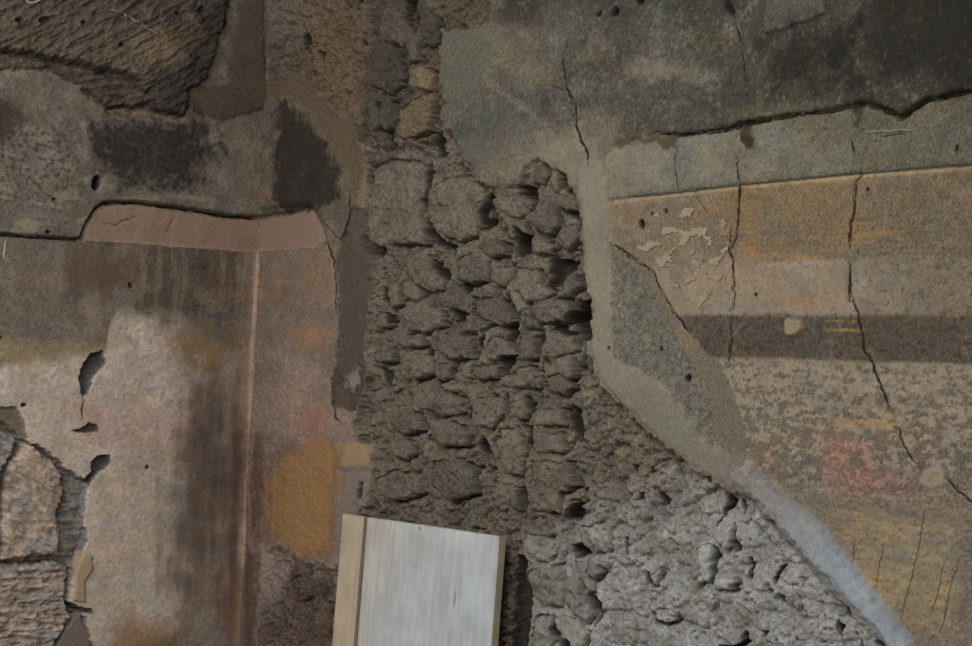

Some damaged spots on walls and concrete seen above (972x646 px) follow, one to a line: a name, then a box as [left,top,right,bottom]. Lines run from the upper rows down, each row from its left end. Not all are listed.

crack [551,49,589,165]
spalling [78,350,106,395]
spalling [256,0,886,646]
crack [611,244,689,333]
crack [629,90,972,469]
spalling [0,403,111,646]
crack [945,477,972,503]